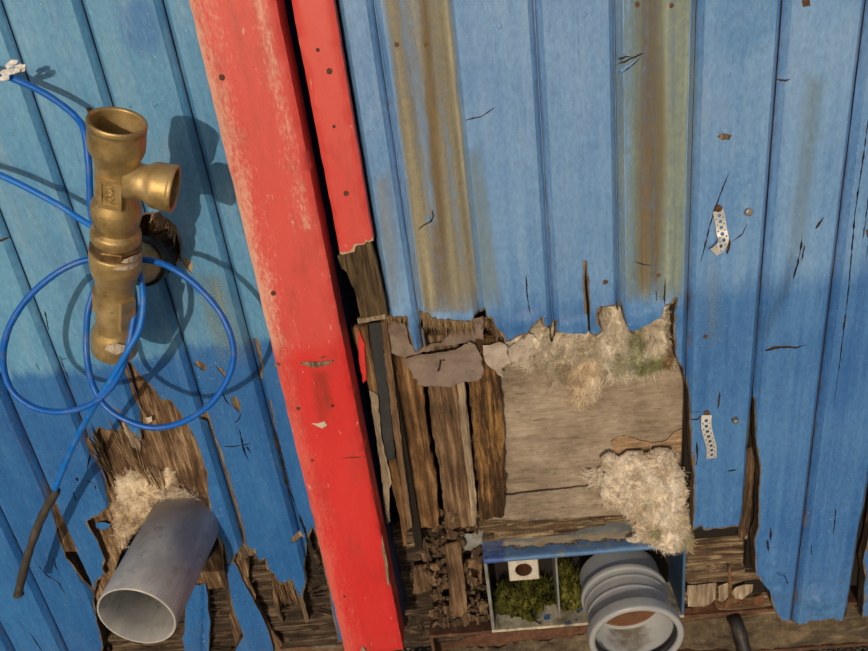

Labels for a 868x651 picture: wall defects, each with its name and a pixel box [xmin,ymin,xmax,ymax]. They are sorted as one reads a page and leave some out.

peeling [254,338,281,379]
peeling [299,356,335,368]
peeling [201,405,257,560]
peeling [382,536,390,586]